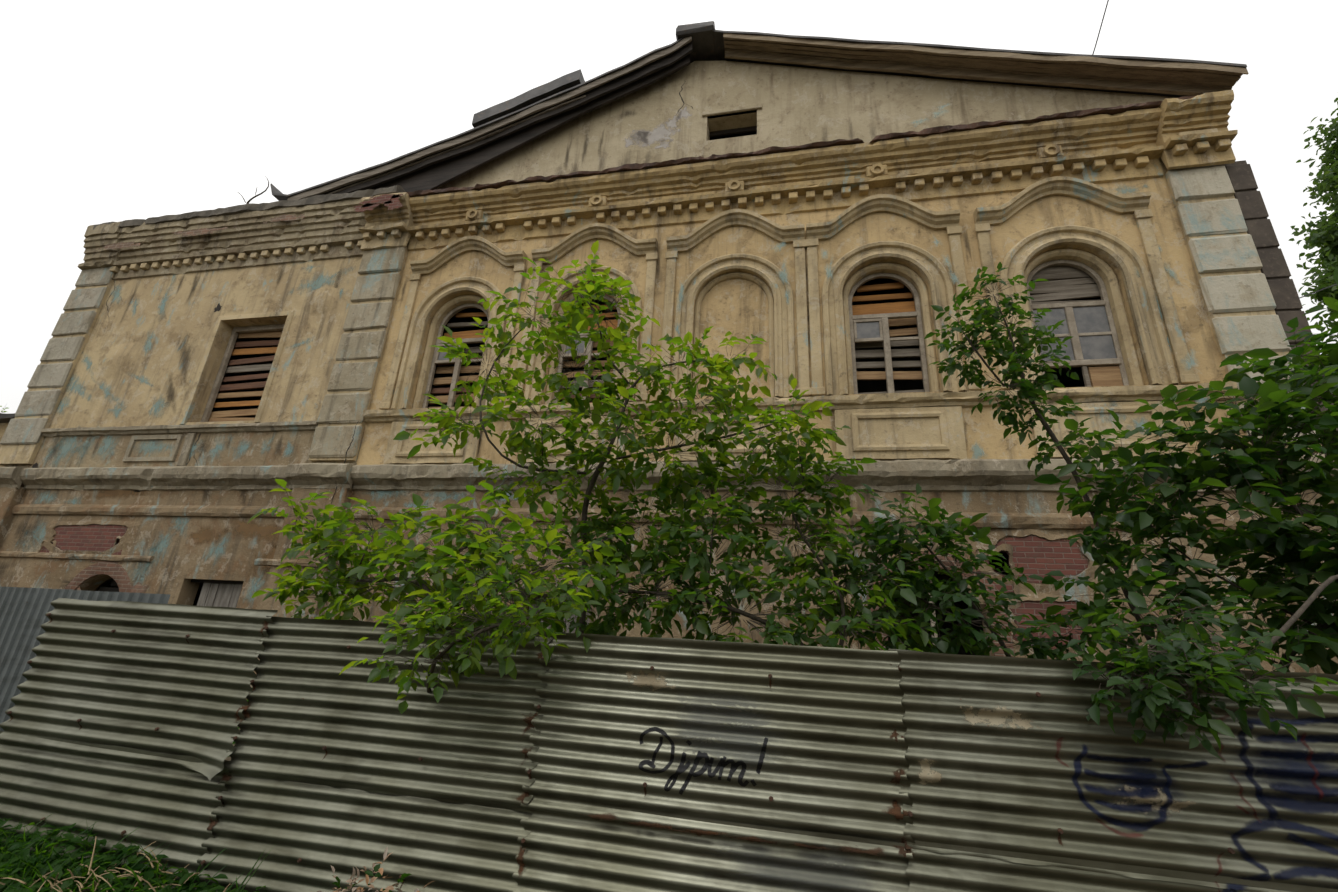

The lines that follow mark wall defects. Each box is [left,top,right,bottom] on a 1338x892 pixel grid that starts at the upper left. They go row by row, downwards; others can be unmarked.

peeling [625,107,692,148]
spalling [23,520,142,563]
spalling [968,529,1105,656]
corrosion [588,813,722,836]
corrosion [517,846,525,875]
corrosion [794,838,914,857]